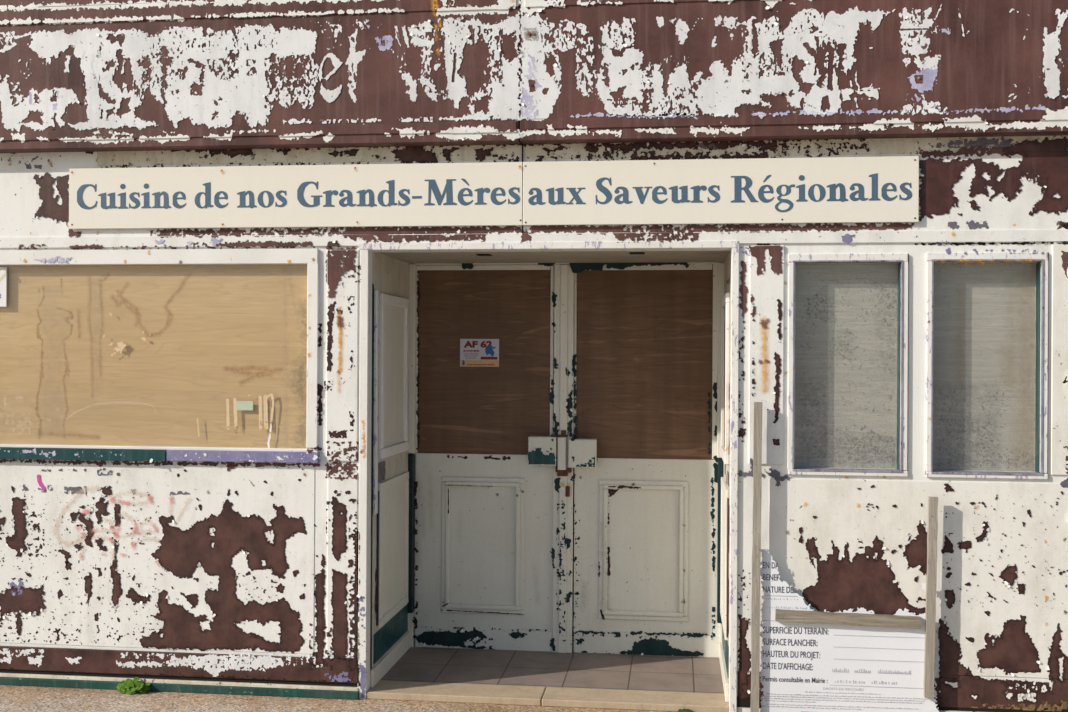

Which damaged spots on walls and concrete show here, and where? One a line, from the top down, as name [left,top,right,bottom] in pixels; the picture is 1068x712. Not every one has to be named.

peeling [0,411,377,699]
peeling [528,354,577,466]
peeling [412,456,715,657]
peeling [707,382,792,571]
rust [759,319,770,392]
peeling [794,520,927,615]
peeling [938,446,1068,710]